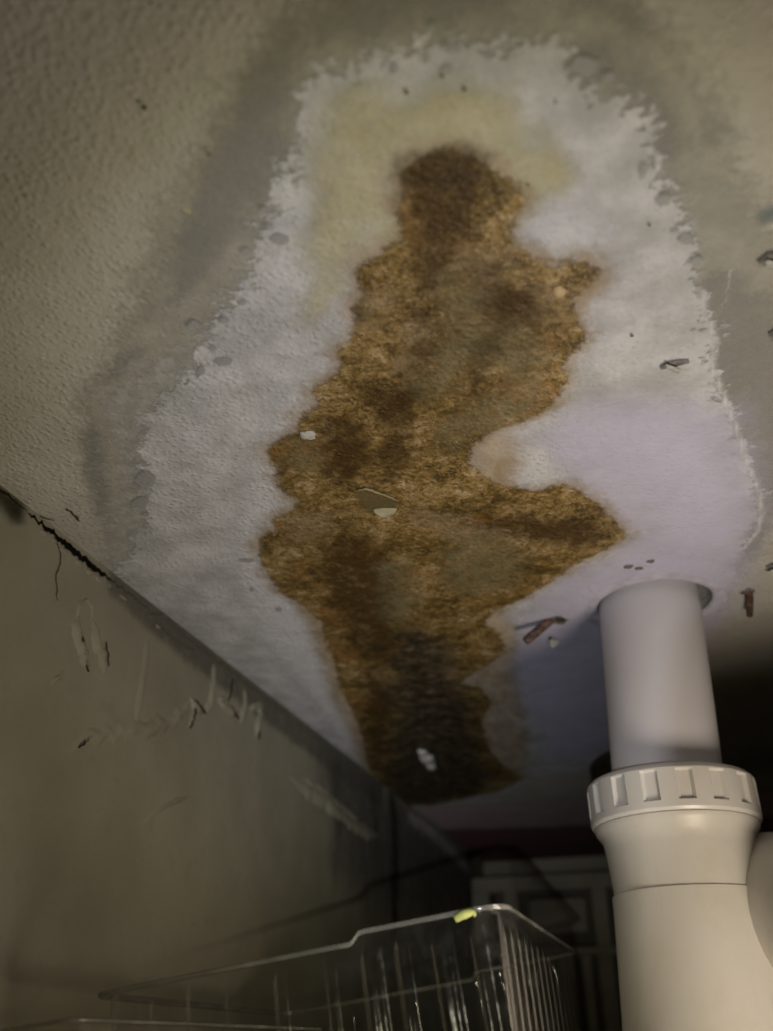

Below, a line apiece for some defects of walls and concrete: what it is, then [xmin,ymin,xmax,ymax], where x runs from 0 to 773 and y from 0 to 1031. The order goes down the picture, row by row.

crack [2,490,248,685]
peeling [354,488,399,518]
water stain [76,0,773,803]
rust [253,144,625,805]
peeling [660,360,689,373]